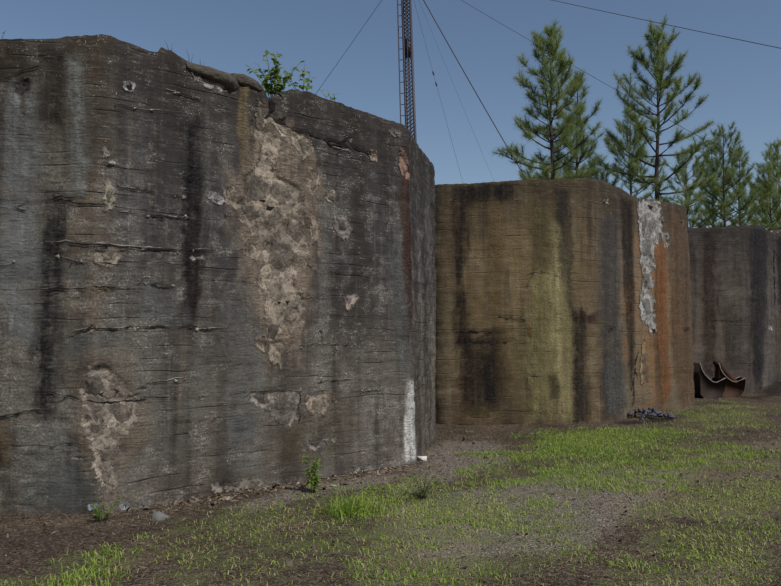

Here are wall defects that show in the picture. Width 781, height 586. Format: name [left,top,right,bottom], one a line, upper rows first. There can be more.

water stain [46,57,89,193]
water stain [0,189,65,418]
crack [40,282,176,294]
crack [46,240,210,267]
spalling [206,98,353,369]
water stain [455,183,514,303]
water stain [525,190,589,424]
spalling [636,197,670,385]
crack [0,376,201,418]
spalling [78,362,147,512]
spalling [250,388,337,428]